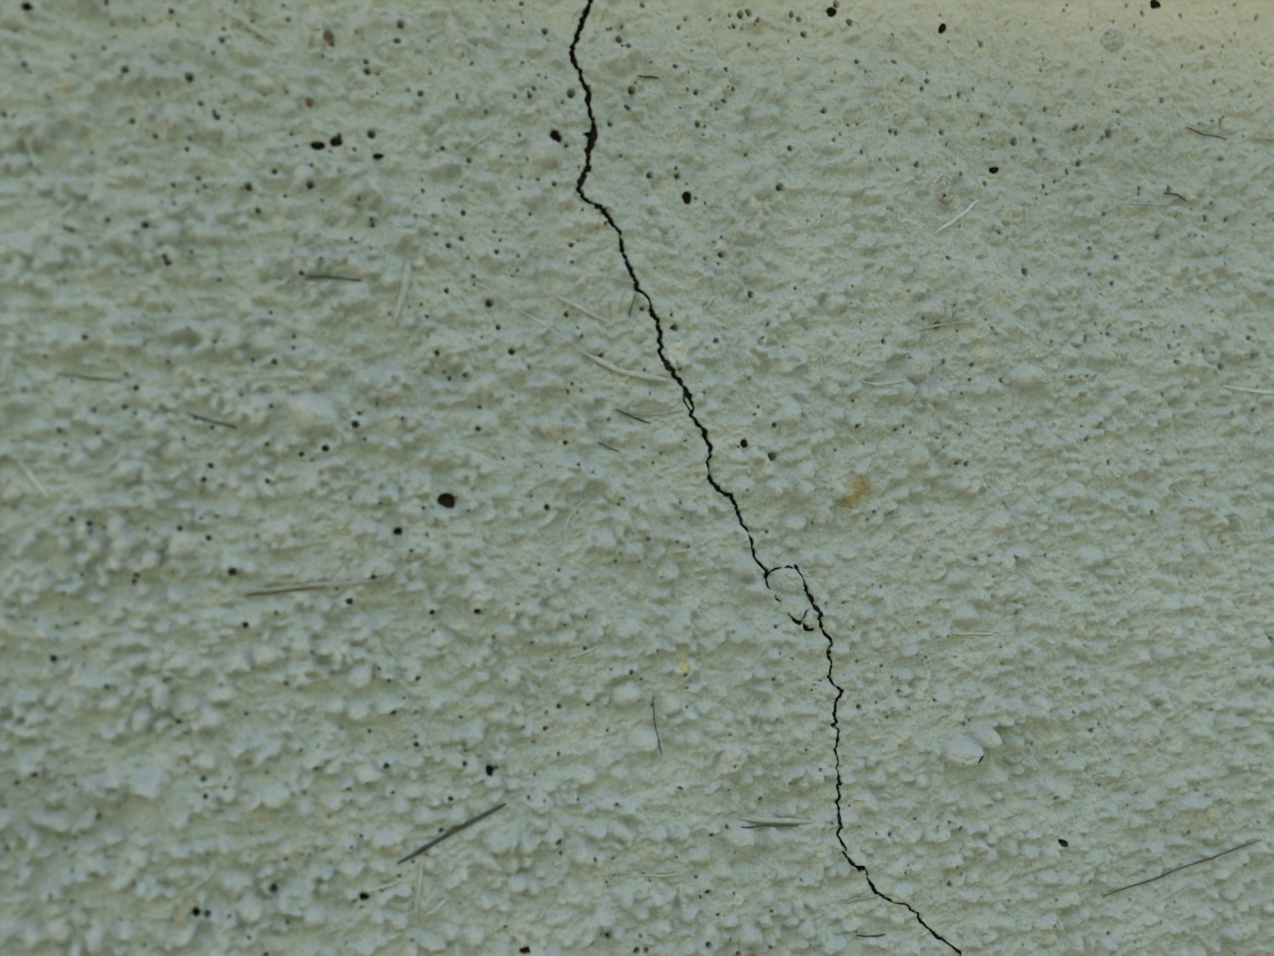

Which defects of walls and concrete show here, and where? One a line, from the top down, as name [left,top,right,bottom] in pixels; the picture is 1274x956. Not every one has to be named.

crack [569,0,961,956]